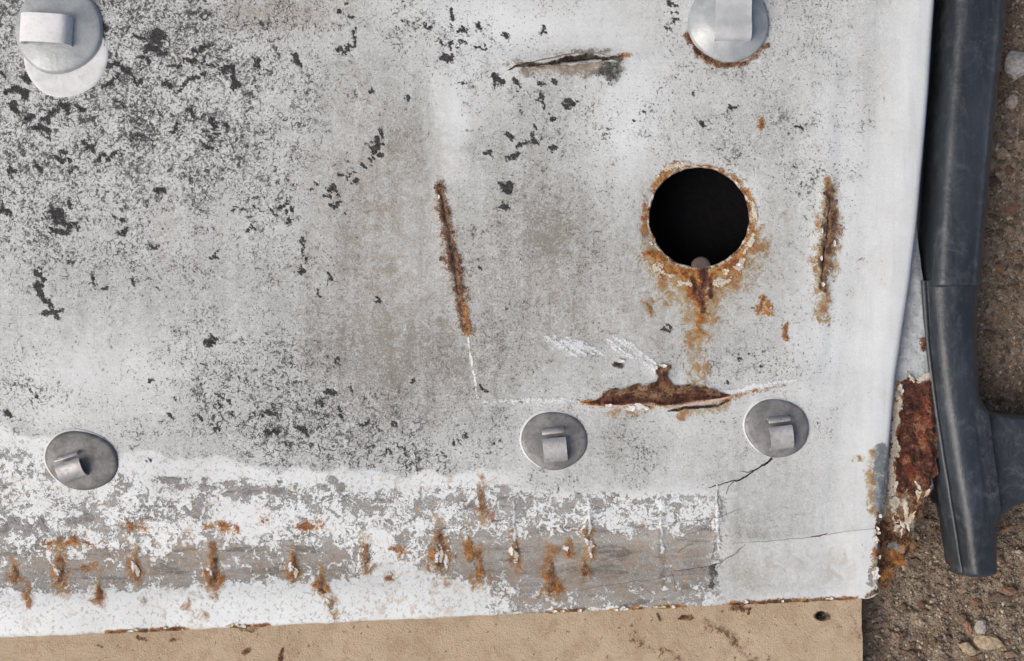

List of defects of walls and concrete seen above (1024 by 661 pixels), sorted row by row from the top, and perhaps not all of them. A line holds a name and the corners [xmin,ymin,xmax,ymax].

crack [506,48,624,86]
rust [683,32,770,68]
rust [433,180,475,336]
rust [637,160,774,387]
rust [810,176,843,326]
peeling [157,476,217,493]
peeling [238,485,290,497]
peeling [325,476,347,493]
crack [709,457,773,494]
rust [723,378,939,605]
peeling [0,517,48,534]
peeling [65,513,94,526]